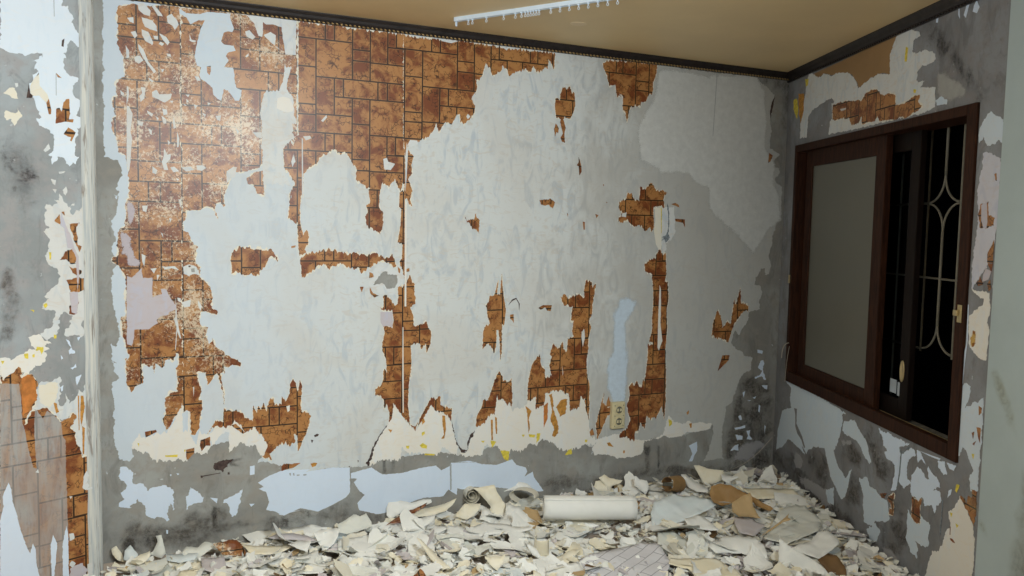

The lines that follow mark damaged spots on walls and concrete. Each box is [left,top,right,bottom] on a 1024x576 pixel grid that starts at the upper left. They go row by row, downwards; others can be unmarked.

peeling [245,30,279,49]
peeling [126,2,221,181]
peeling [383,140,418,190]
spalling [368,262,405,296]
spalling [201,459,233,478]
peeling [899,448,956,488]
peeling [826,487,834,505]
peeling [867,523,880,543]
peeling [69,561,93,576]